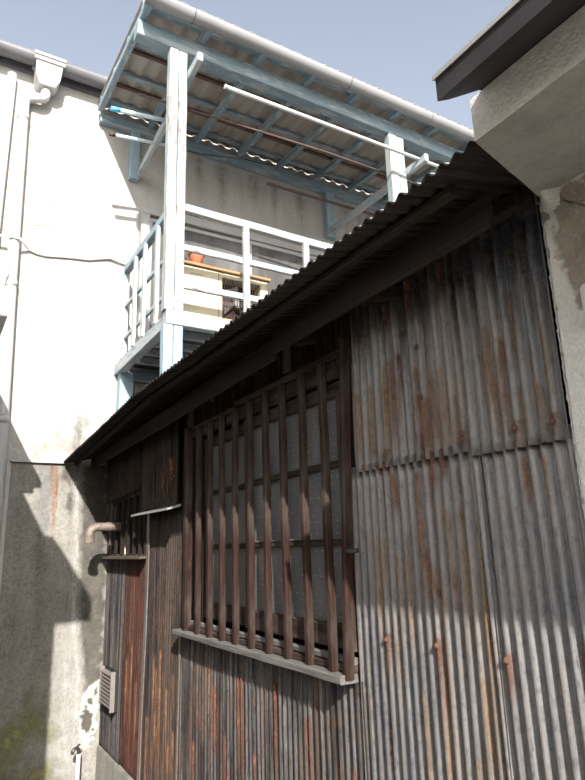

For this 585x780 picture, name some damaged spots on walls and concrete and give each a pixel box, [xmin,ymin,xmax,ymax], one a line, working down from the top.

spalling [539,203,585,519]
damp [51,465,109,779]
peeling [77,680,100,751]
corrosion [207,665,230,780]
corrosion [436,640,449,706]
corrosion [476,682,494,780]